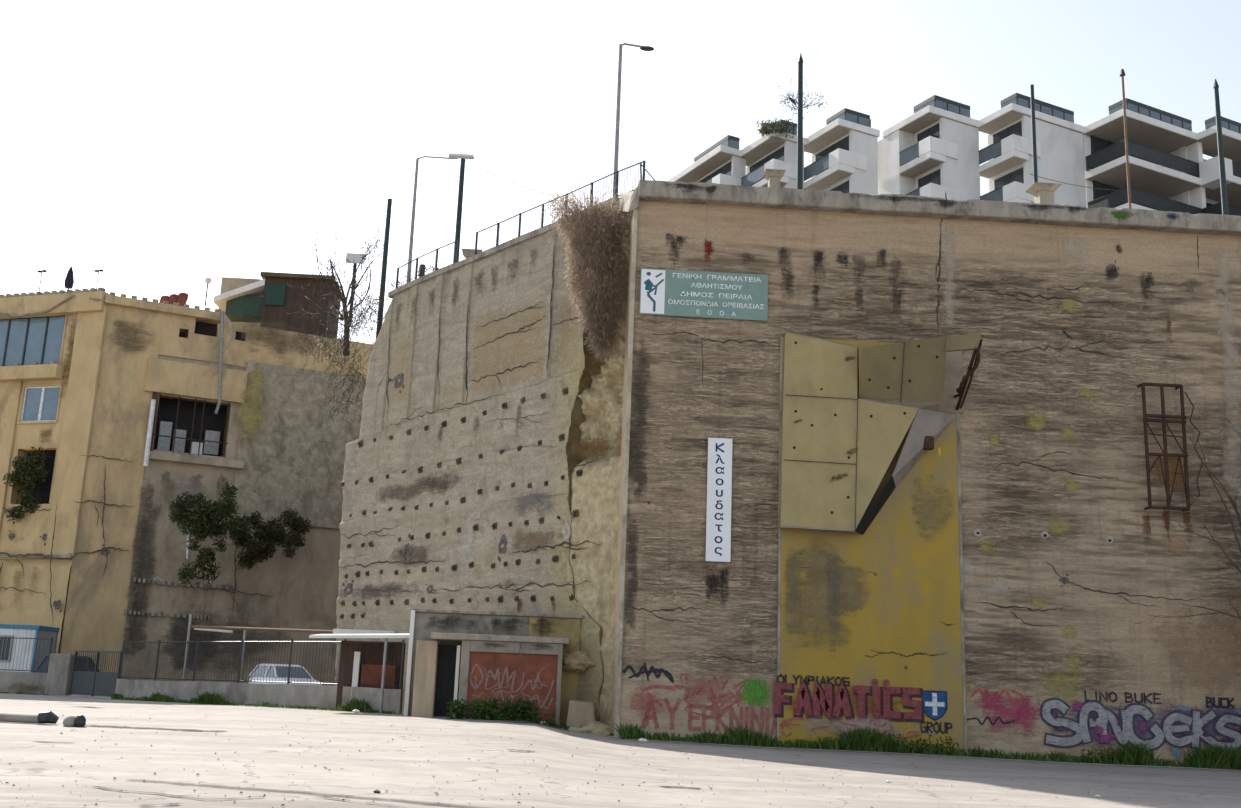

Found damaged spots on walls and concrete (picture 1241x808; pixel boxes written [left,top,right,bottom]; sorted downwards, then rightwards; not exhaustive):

damp [779,249,795,293]
damp [814,251,848,270]
crack [936,191,1123,358]
corrosion [1143,511,1191,543]
damp [124,484,159,654]
crack [977,562,1204,626]
crack [865,622,954,657]